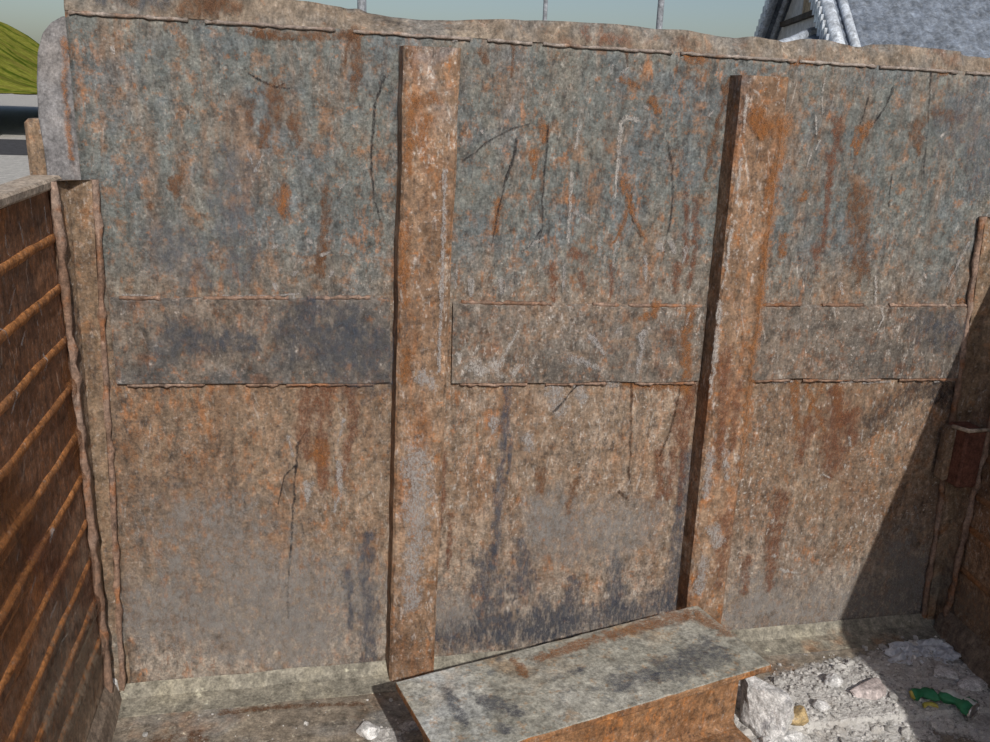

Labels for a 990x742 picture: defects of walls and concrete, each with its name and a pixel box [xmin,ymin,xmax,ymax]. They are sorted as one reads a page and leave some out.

crack [370,76,386,220]
crack [463,123,549,250]
rust [813,118,872,268]
crack [860,87,895,123]
leakage [456,330,519,376]
rust [715,104,792,475]
rust [63,361,85,478]
crack [278,432,306,619]
leakage [435,364,692,653]
crack [618,382,633,499]
leakage [702,449,730,498]
rust [791,381,953,479]